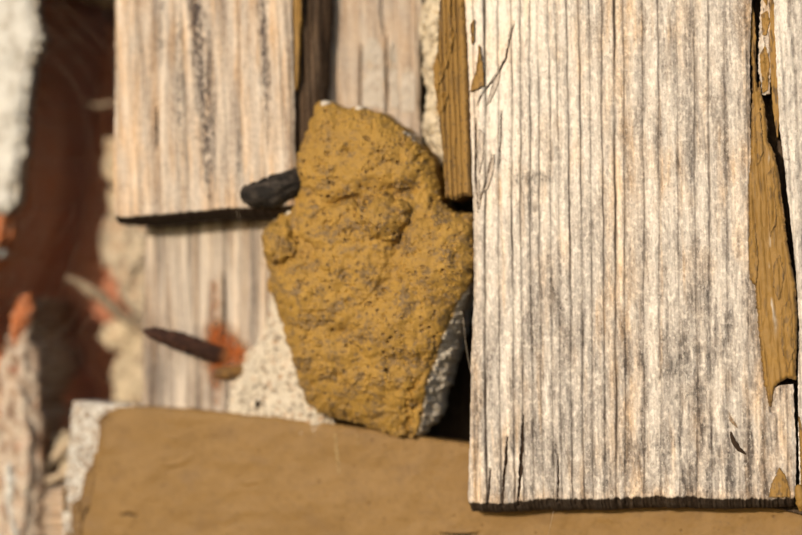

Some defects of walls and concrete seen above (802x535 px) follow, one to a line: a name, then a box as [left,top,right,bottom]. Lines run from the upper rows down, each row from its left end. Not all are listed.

peeling [433,0,465,117]
crack [475,26,514,204]
spalling [0,217,17,258]
peeling [748,0,798,407]
spalling [9,293,37,347]
rust [206,283,247,388]
peeling [61,463,94,535]
peeling [98,414,112,437]
peeling [769,416,802,512]